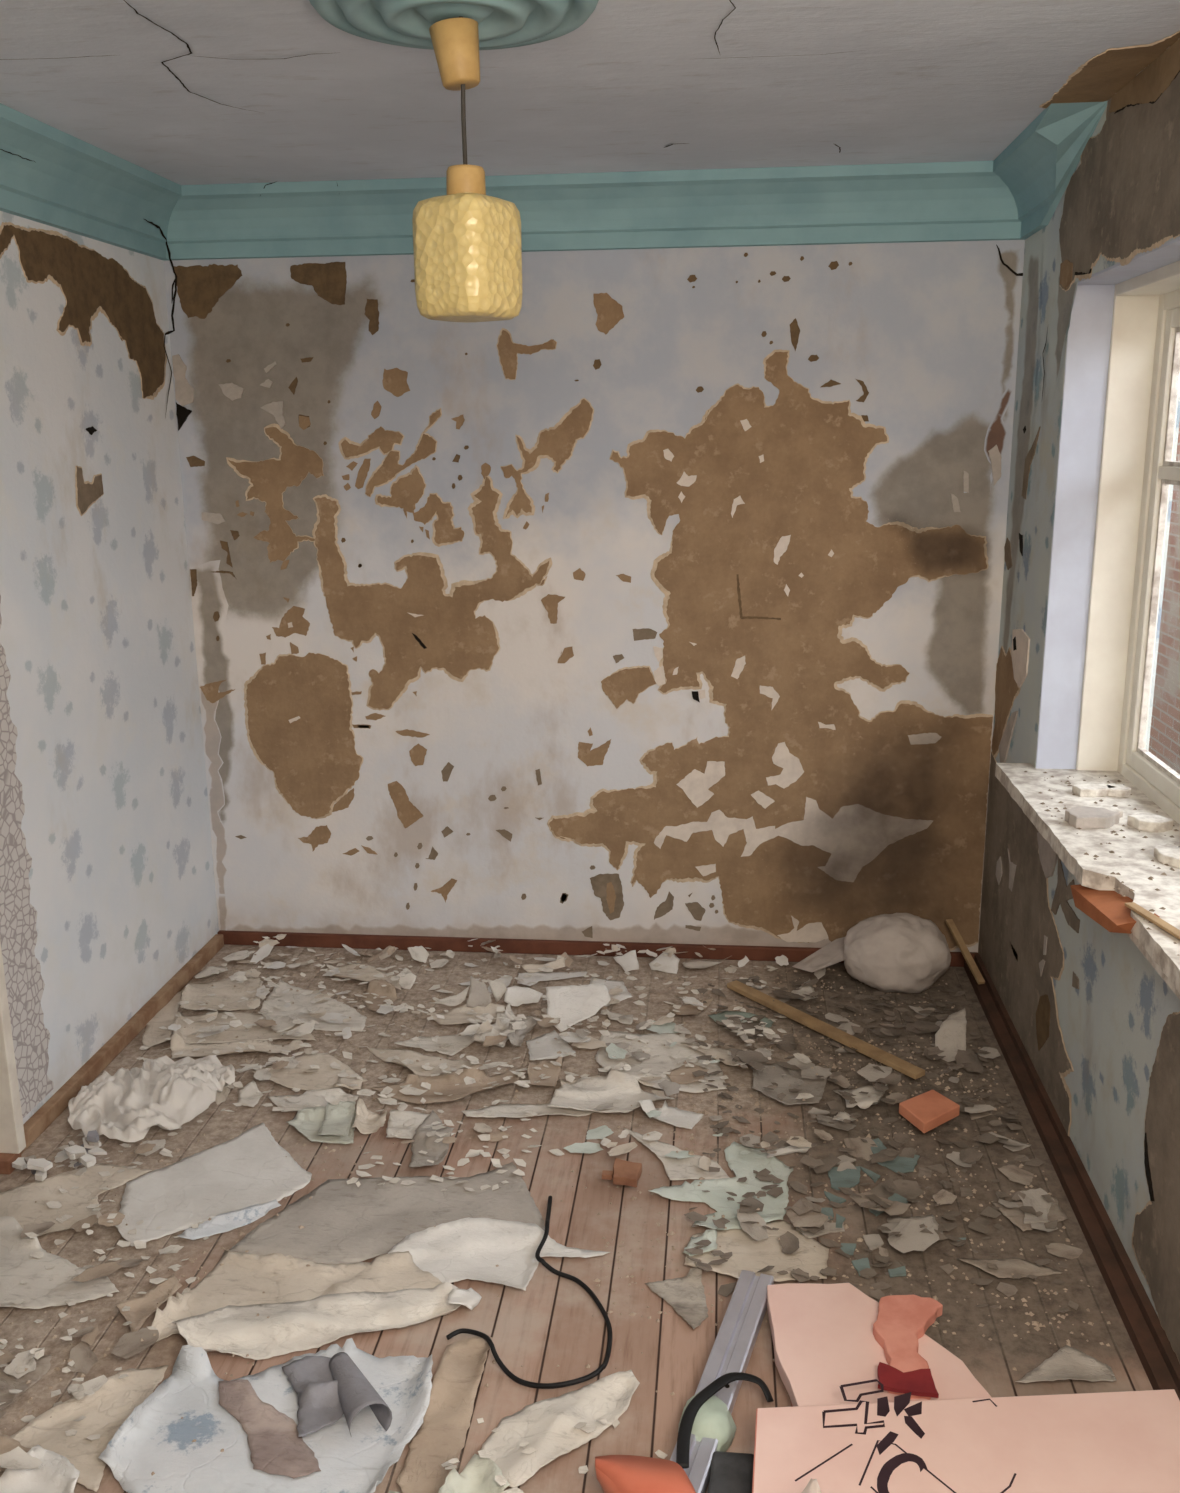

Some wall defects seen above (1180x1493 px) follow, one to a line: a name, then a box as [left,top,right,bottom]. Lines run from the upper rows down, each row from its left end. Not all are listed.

crack [124,0,261,113]
crack [707,0,863,59]
spalling [1039,31,1180,292]
crack [144,219,177,417]
peeling [790,318,819,362]
peeling [821,379,869,422]
damp [856,245,1079,715]
damp [165,258,831,948]
peeling [633,628,657,641]
peeling [395,729,430,766]
damp [823,772,928,900]
spalling [978,751,1080,1136]